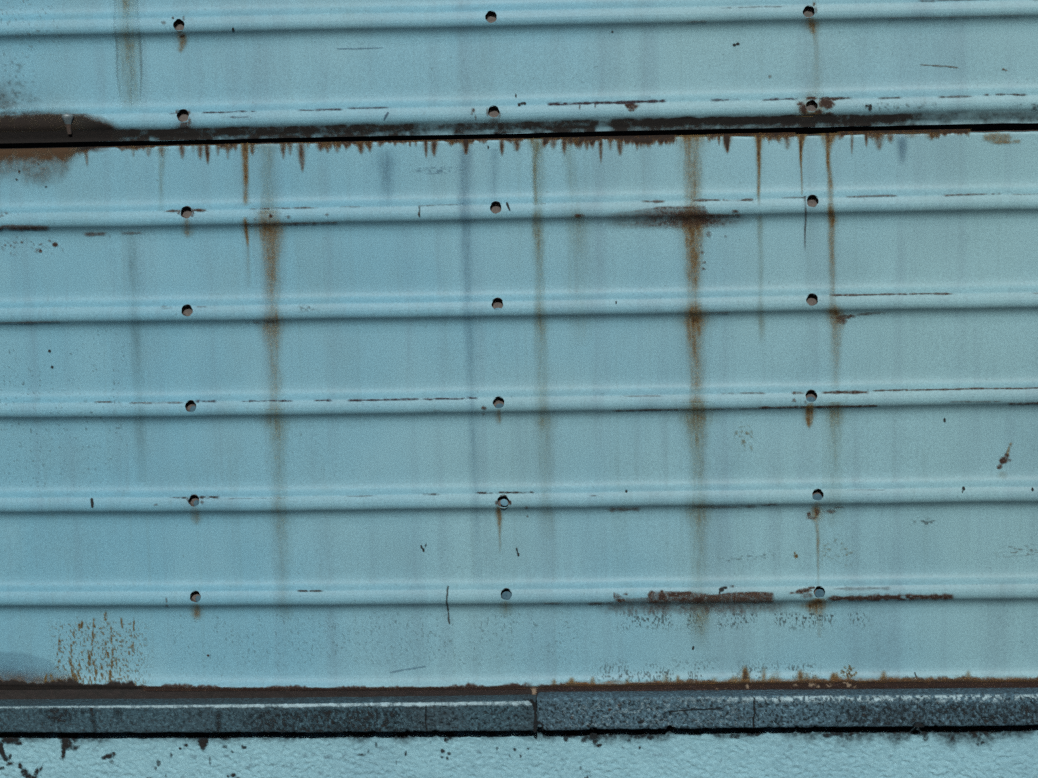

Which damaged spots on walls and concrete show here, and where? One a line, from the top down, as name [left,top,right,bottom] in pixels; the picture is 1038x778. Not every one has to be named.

corrosion [798,97,836,117]
corrosion [821,129,969,188]
corrosion [0,112,806,285]
corrosion [686,303,703,367]
corrosion [829,307,872,323]
corrosion [614,590,772,618]
corrosion [790,587,825,612]
corrosion [0,613,1038,692]